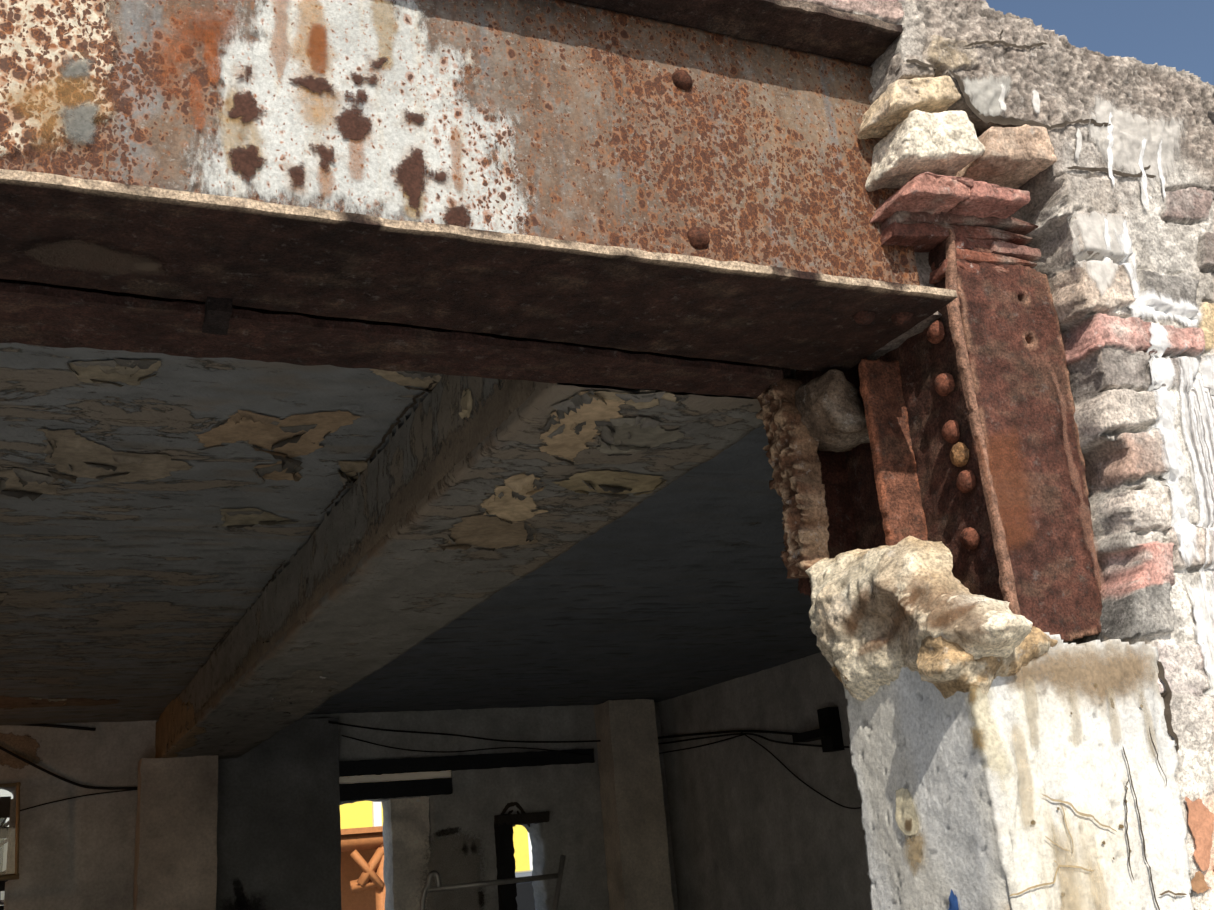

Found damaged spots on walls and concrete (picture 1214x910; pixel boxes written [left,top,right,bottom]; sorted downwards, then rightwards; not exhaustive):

peeling [0,0,119,157]
peeling [191,0,536,235]
efflorescence [963,74,1011,116]
efflorescence [1032,90,1040,113]
damp [1075,96,1183,210]
peeling [67,358,162,387]
peeling [195,410,360,483]
peeling [369,369,444,393]
peeling [437,388,685,551]
damp [1067,211,1214,696]
spalling [917,626,1058,774]
crack [1009,661,1187,910]